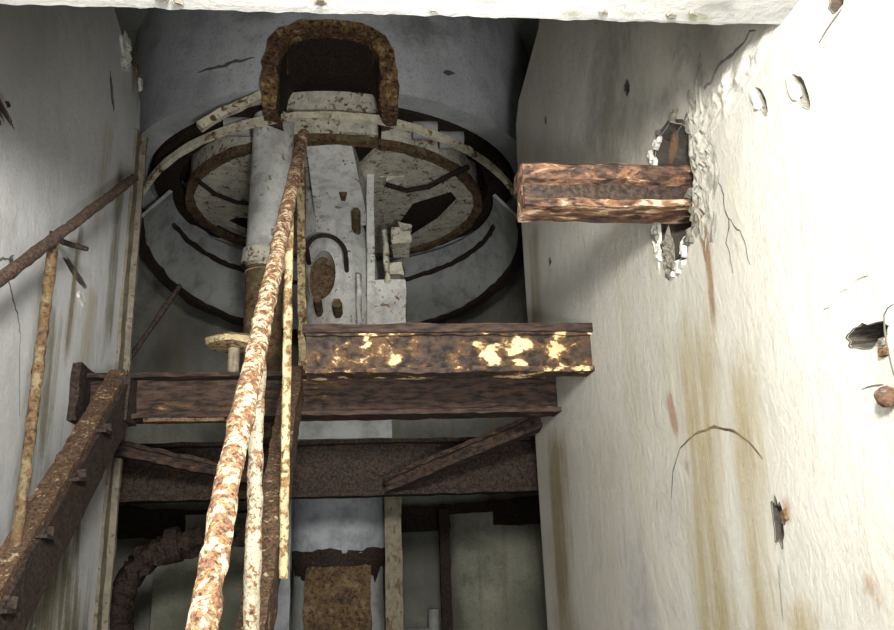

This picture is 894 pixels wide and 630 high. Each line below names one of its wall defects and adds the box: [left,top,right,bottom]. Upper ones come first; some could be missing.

spalling [0,89,15,130]
spalling [749,87,768,116]
spalling [785,74,810,109]
spalling [647,52,720,311]
crack [0,255,21,414]
peeling [780,508,789,525]